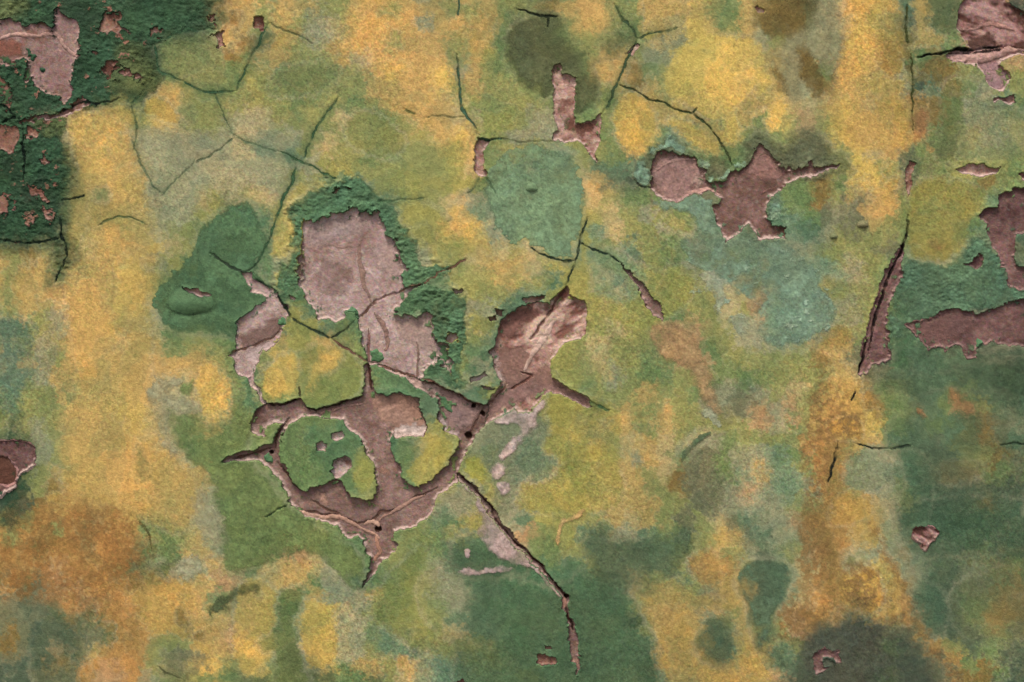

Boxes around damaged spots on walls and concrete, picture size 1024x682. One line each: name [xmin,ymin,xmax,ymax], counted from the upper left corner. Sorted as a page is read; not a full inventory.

peeling [0,8,143,154]
crack [59,5,302,161]
crack [443,67,502,142]
peeling [551,64,602,163]
crack [606,6,731,162]
peeling [946,0,1024,105]
crack [214,101,533,524]
crack [530,219,620,337]
peeling [650,144,840,243]
peeling [904,172,1024,360]
peeling [222,207,591,677]
crack [462,476,574,629]